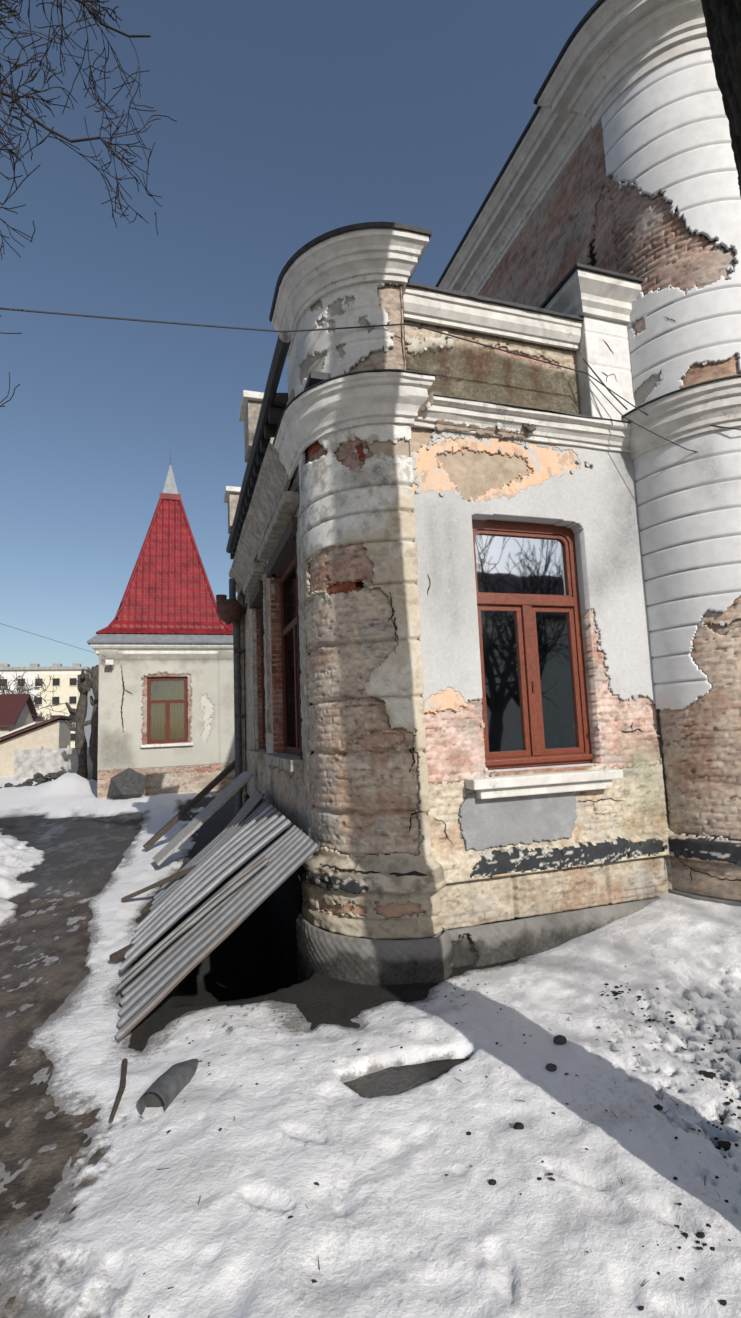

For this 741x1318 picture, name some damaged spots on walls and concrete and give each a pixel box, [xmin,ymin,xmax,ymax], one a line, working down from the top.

spalling [592,175,735,298]
spalling [300,284,454,384]
spalling [633,313,647,335]
spalling [635,354,741,407]
flaking render [306,421,592,502]
spalling [261,561,273,732]
crack [388,592,399,641]
spalling [272,544,494,859]
spalling [470,596,741,878]
peeling [297,865,426,919]